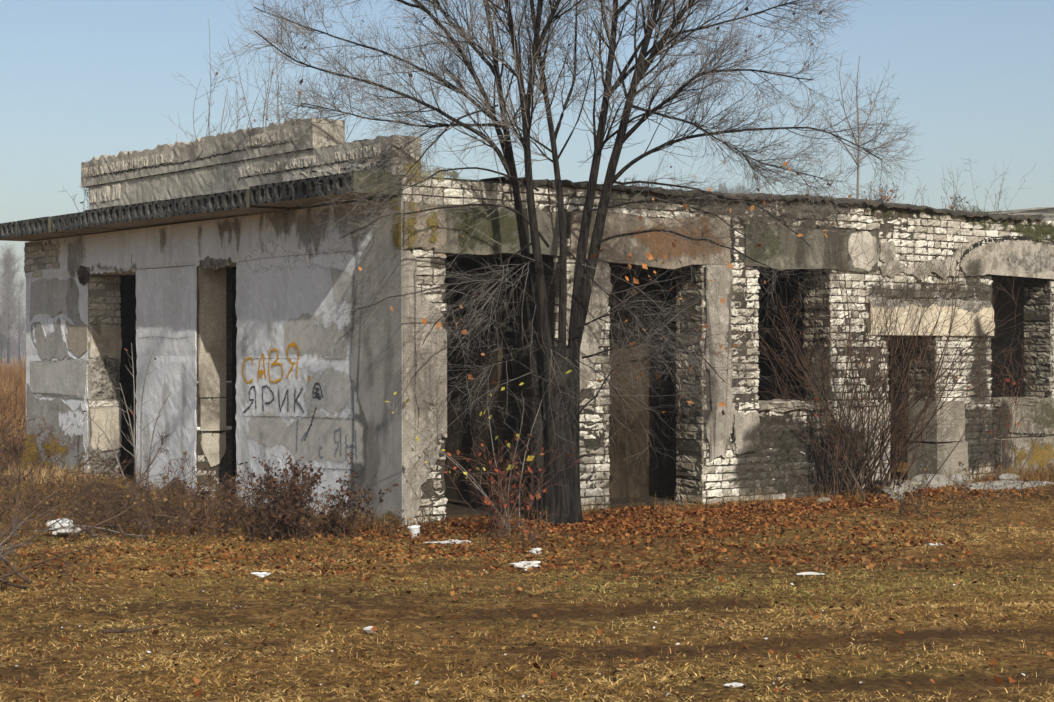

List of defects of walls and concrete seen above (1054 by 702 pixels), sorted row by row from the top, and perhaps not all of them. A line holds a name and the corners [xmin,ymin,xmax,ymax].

spalling [199,256,231,270]
damp [218,218,240,251]
damp [259,202,371,262]
peeling [24,239,121,479]
peeling [245,241,363,464]